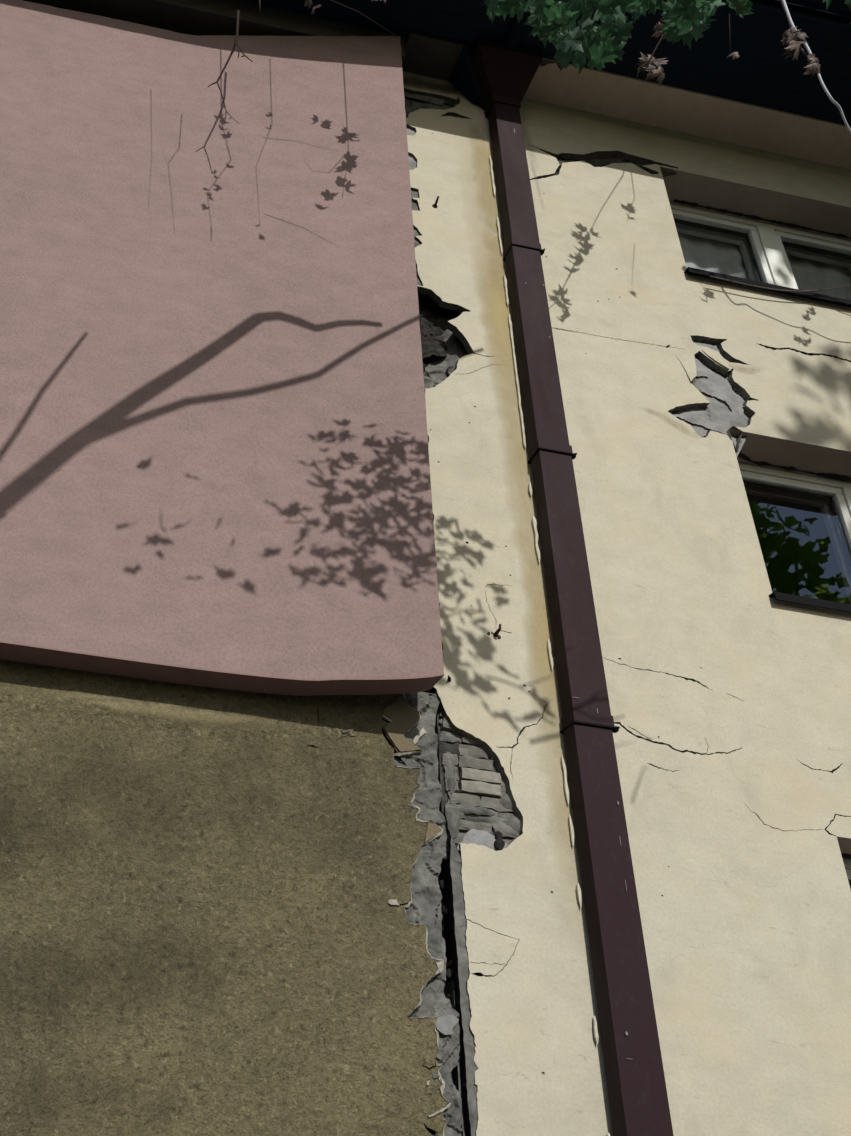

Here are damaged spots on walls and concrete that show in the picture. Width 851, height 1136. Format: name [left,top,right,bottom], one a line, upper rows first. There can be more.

spalling [404,88,460,136]
spalling [408,152,417,170]
spalling [411,187,420,211]
crack [529,144,851,239]
spalling [413,225,422,247]
spalling [416,263,474,391]
crack [757,343,851,362]
spalling [666,335,758,457]
crack [602,657,740,700]
crack [614,722,741,772]
crack [744,803,851,858]
spalling [383,675,523,1136]